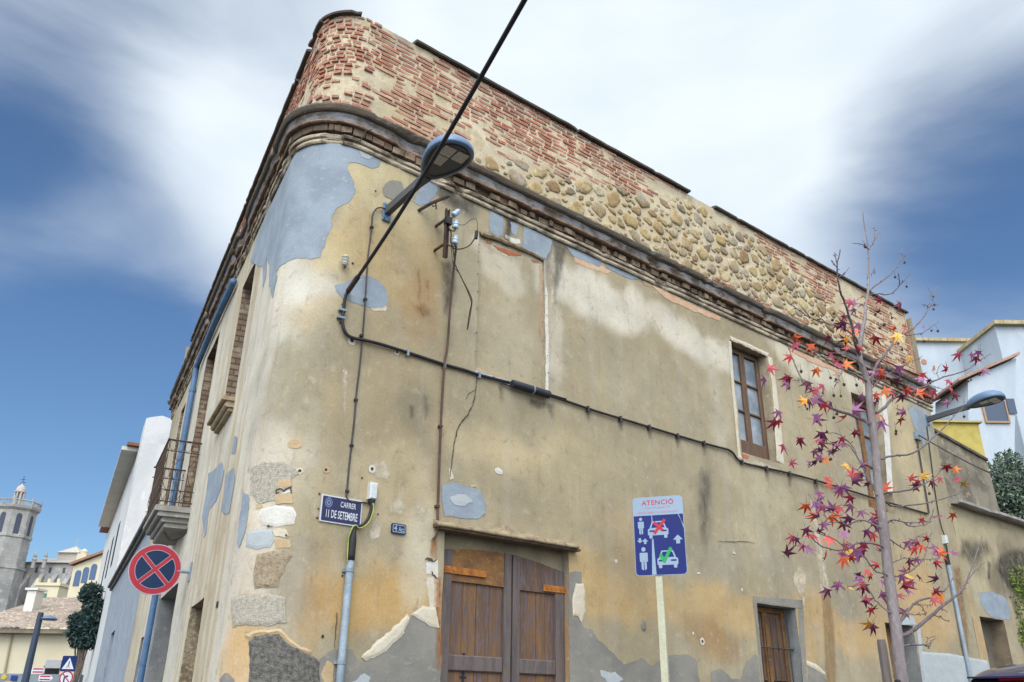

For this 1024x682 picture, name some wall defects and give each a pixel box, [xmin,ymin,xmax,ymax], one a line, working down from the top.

peeling [231,462,442,682]
peeling [569,571,760,682]